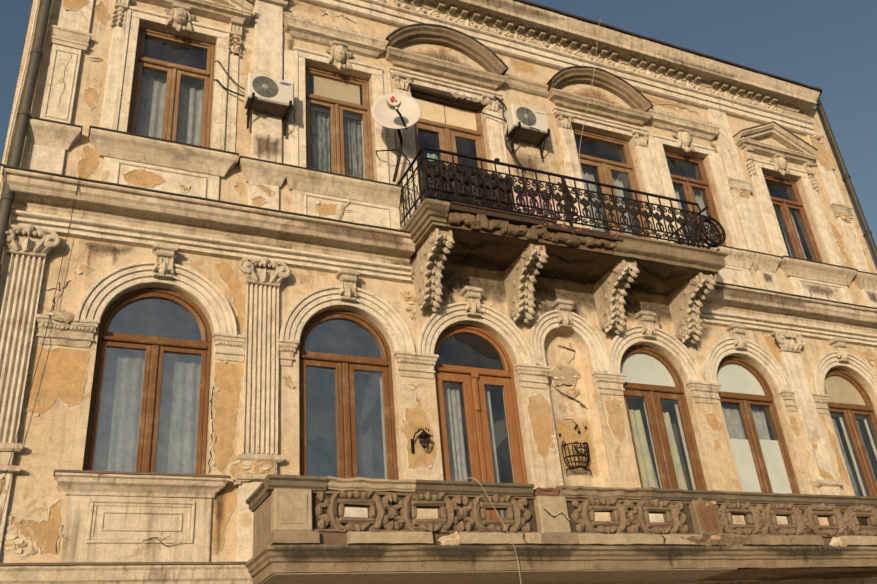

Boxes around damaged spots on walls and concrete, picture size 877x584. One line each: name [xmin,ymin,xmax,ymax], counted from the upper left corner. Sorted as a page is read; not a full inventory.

peeling [62,0,110,26]
peeling [76,145,100,179]
peeling [122,167,166,188]
peeling [22,345,91,416]
peeling [400,383,437,469]
peeling [526,392,557,460]
spalling [548,365,582,397]
crack [555,387,588,410]
peeling [209,361,277,555]
peeling [0,499,62,560]